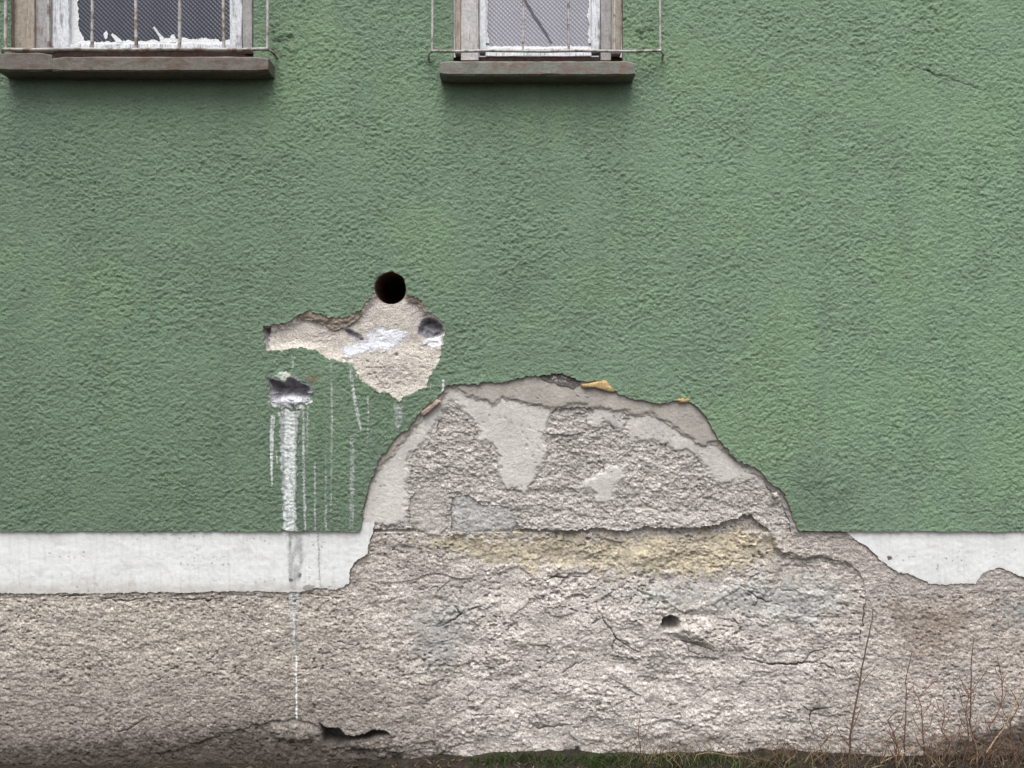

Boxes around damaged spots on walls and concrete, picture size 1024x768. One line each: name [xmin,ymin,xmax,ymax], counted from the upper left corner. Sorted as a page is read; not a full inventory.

water stain [270,392,332,579]
flaking render [164,290,1024,765]
crack [744,650,836,674]